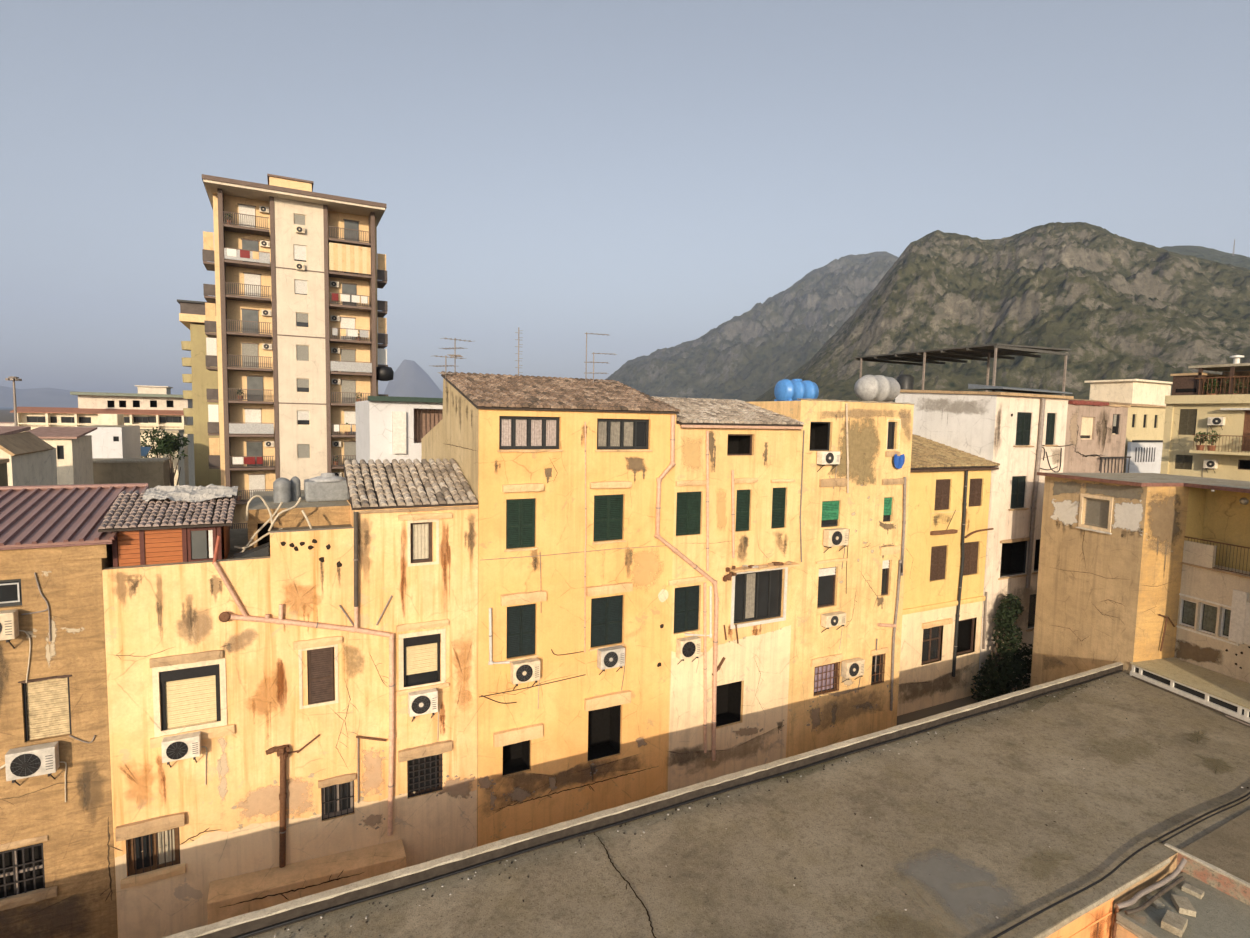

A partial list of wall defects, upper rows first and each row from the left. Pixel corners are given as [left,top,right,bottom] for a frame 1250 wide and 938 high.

water stain [829,416,880,486]
peeling [1051,482,1095,526]
flaking render [435,774,557,810]
crack [499,766,658,809]
crack [594,833,656,938]